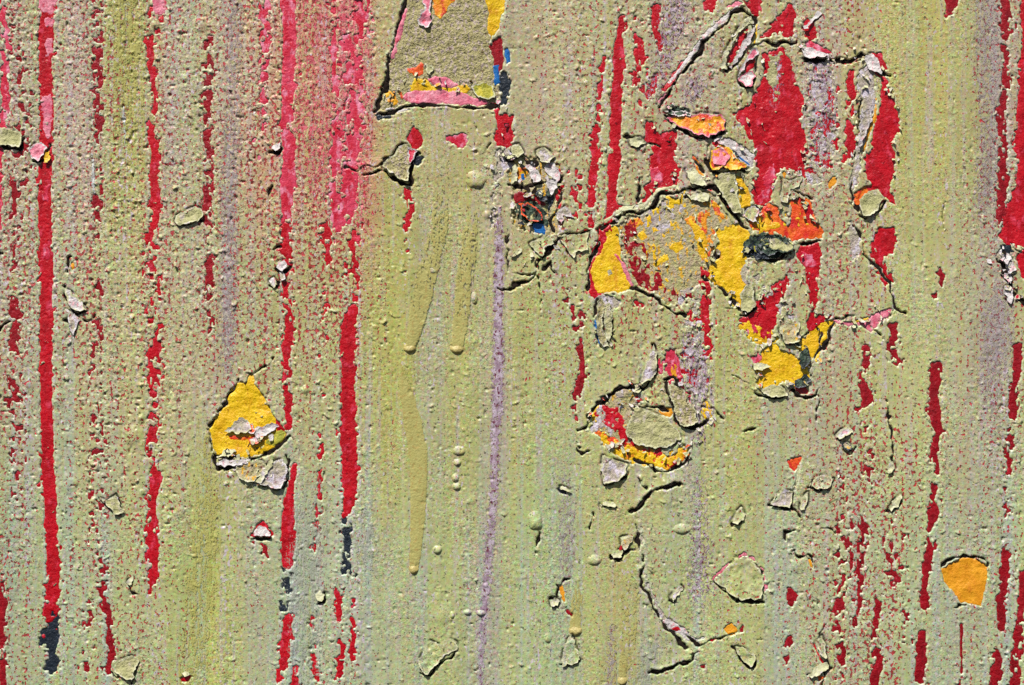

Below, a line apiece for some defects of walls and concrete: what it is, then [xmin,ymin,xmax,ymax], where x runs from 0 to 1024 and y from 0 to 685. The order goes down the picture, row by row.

peeling [344,126,424,186]
peeling [373,0,901,421]
peeling [986,0,1024,306]
peeling [208,357,291,489]
peeling [577,343,716,486]
peeling [835,426,856,455]
crack [628,478,743,674]
peeling [711,552,768,604]
peeling [941,554,989,608]